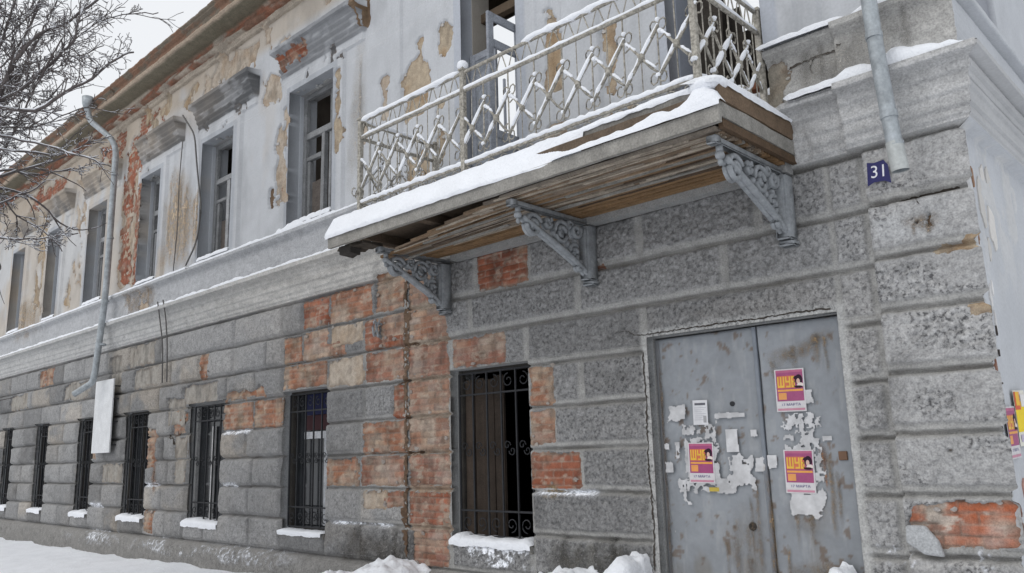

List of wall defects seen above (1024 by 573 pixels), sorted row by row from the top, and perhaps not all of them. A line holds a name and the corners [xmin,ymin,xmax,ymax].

flaking render [380,37,445,124]
flaking render [438,21,453,57]
flaking render [544,9,562,92]
crack [789,43,841,71]
spalling [99,21,309,290]
peeling [933,164,998,262]
spalling [477,245,529,292]
spalling [168,259,507,568]
crack [398,272,425,557]
spalling [529,363,583,490]
crack [615,308,830,570]
spalling [909,478,1024,550]